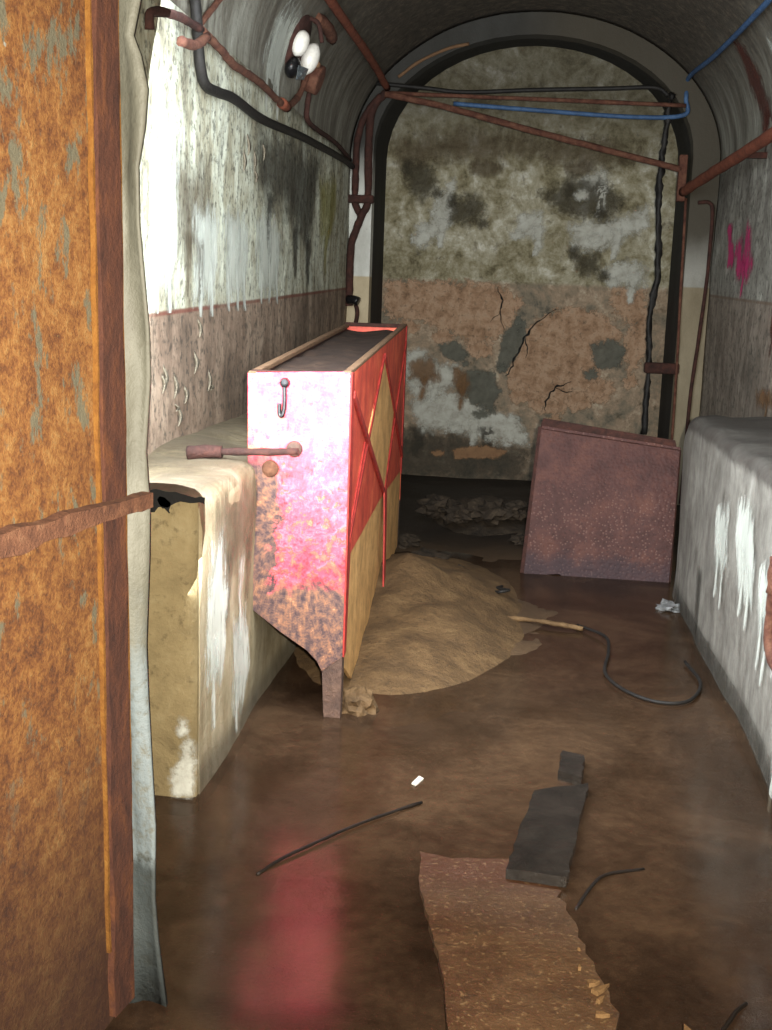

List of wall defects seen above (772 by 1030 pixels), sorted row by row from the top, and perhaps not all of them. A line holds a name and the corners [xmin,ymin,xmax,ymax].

leakage [194,134,318,316]
leakage [403,162,488,248]
leakage [510,211,544,256]
leakage [542,172,649,304]
peeling [382,278,649,421]
crack [490,289,556,376]
leakage [402,349,528,480]
flaking render [431,445,507,459]
crack [544,382,572,410]